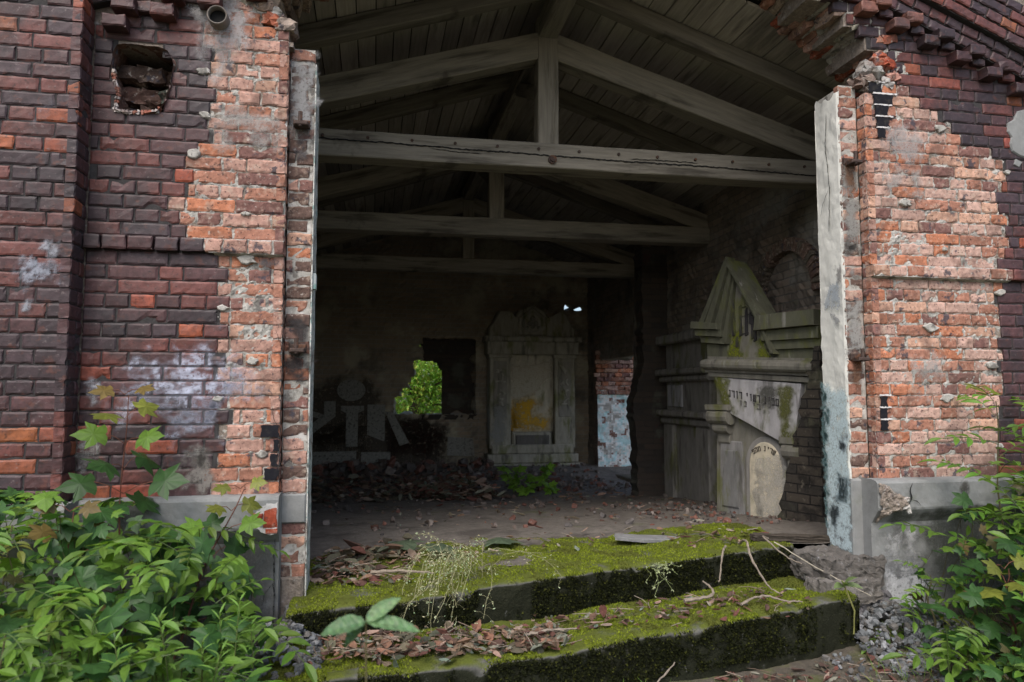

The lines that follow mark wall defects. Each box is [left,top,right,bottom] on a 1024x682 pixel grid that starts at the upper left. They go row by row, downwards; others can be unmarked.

spalling [111,43,176,115]
damp [21,241,57,282]
peeling [859,80,1022,525]